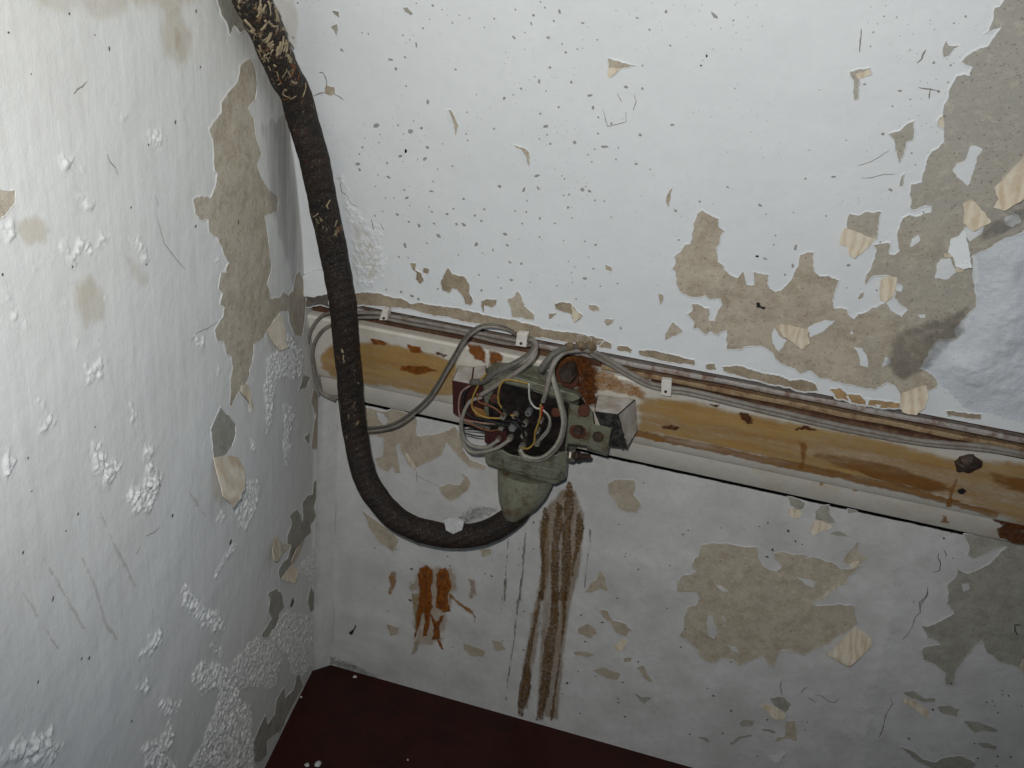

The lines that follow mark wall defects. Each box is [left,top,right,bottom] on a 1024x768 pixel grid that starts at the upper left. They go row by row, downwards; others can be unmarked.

peeling [192,56,329,508]
peeling [355,0,1024,415]
corrosion [551,355,1024,544]
peeling [944,410,983,420]
peeling [261,480,316,639]
corrosion [412,565,475,653]
peeling [675,496,872,669]
peeling [920,528,1024,686]
peeling [254,673,303,765]